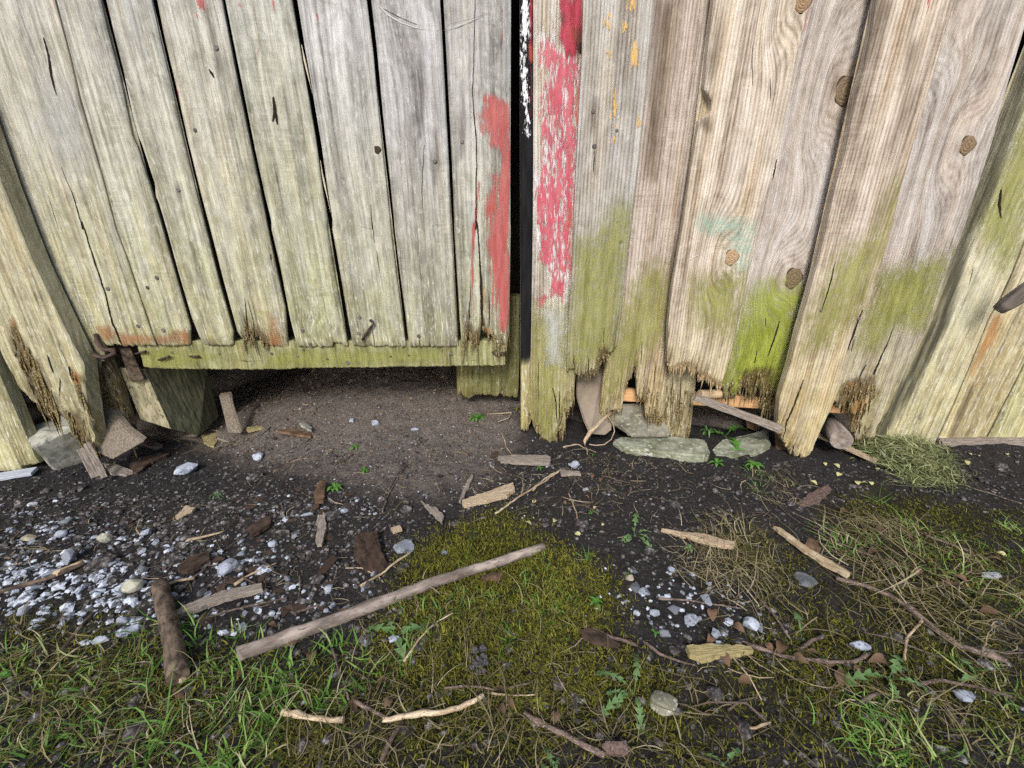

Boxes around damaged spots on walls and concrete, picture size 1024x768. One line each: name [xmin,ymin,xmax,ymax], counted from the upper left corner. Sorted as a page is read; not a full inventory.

crack [43,37,57,95]
crack [47,168,123,345]
peeling [471,0,582,362]
crack [848,310,894,376]